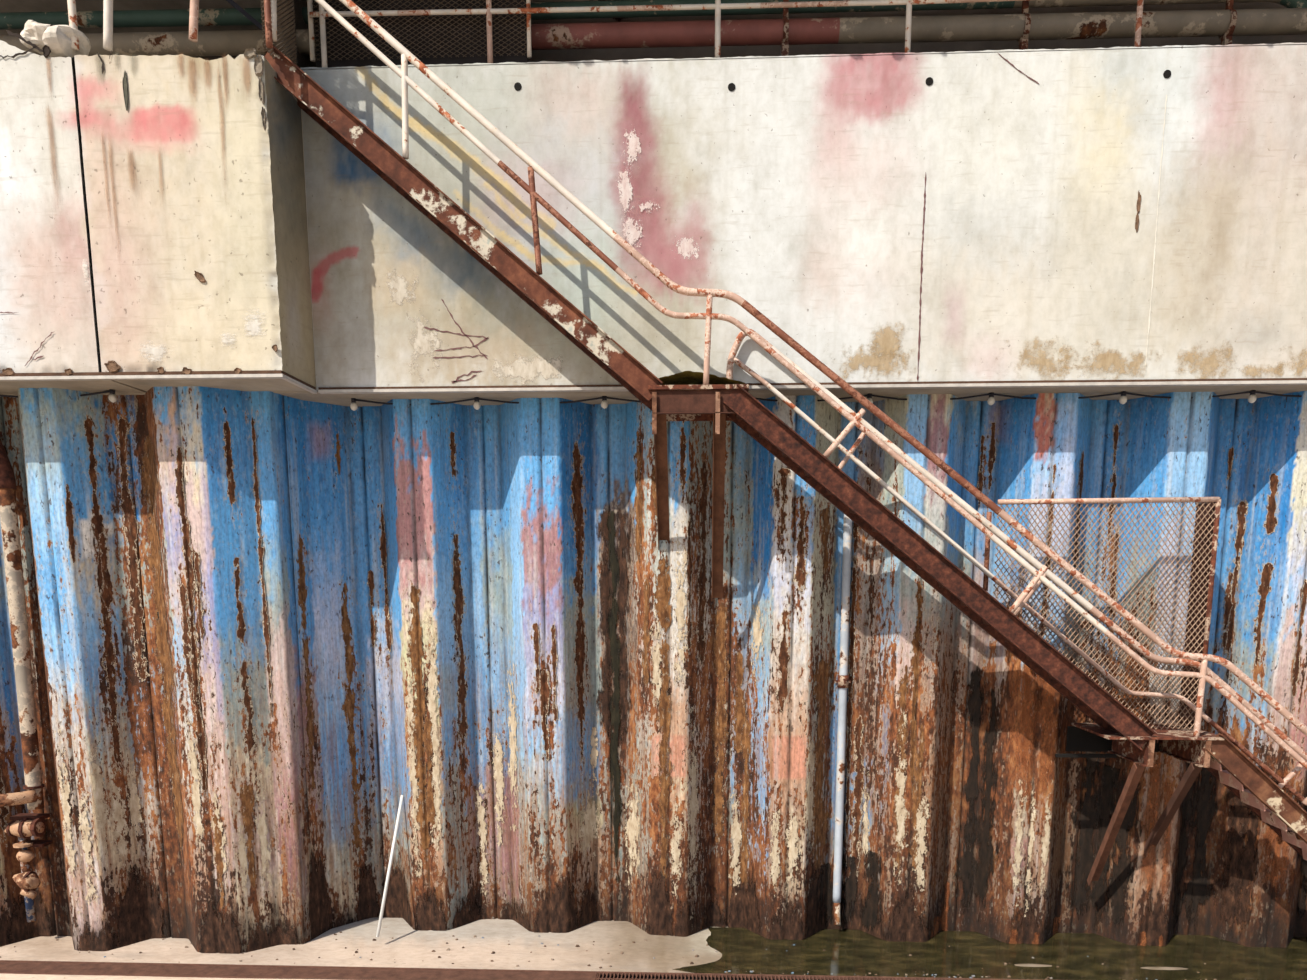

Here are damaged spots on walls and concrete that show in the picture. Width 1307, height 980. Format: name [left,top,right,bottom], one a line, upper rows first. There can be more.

rust [0,370,623,390]
crack [424,299,489,383]
rust [745,378,1307,386]
peeling [54,704,144,914]
rust [83,415,207,847]
peeling [185,713,274,919]
rust [367,504,436,860]
peeling [402,596,444,881]
peeling [473,626,519,904]
damp [596,509,633,883]
rust [634,421,751,887]
rust [845,522,866,877]